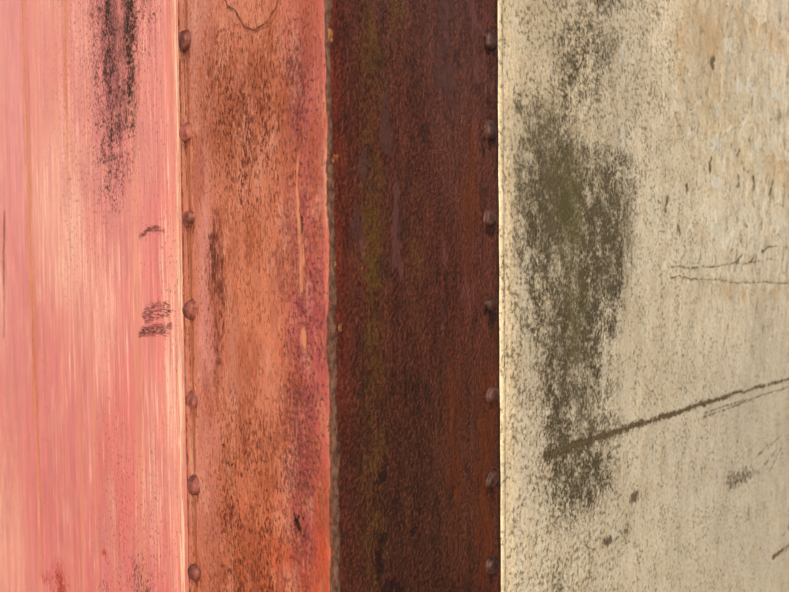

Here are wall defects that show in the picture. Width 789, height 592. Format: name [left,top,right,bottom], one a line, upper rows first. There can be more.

crack [225,0,281,34]
leakage [87,0,158,213]
corrosion [178,0,304,218]
corrosion [182,224,194,303]
corrosion [208,214,225,376]
corrosion [484,304,496,325]
leakage [524,227,546,306]
leakage [583,225,623,375]
crack [669,261,789,284]
corrosion [184,316,197,481]
corrosion [187,403,296,592]
leakage [545,346,611,511]